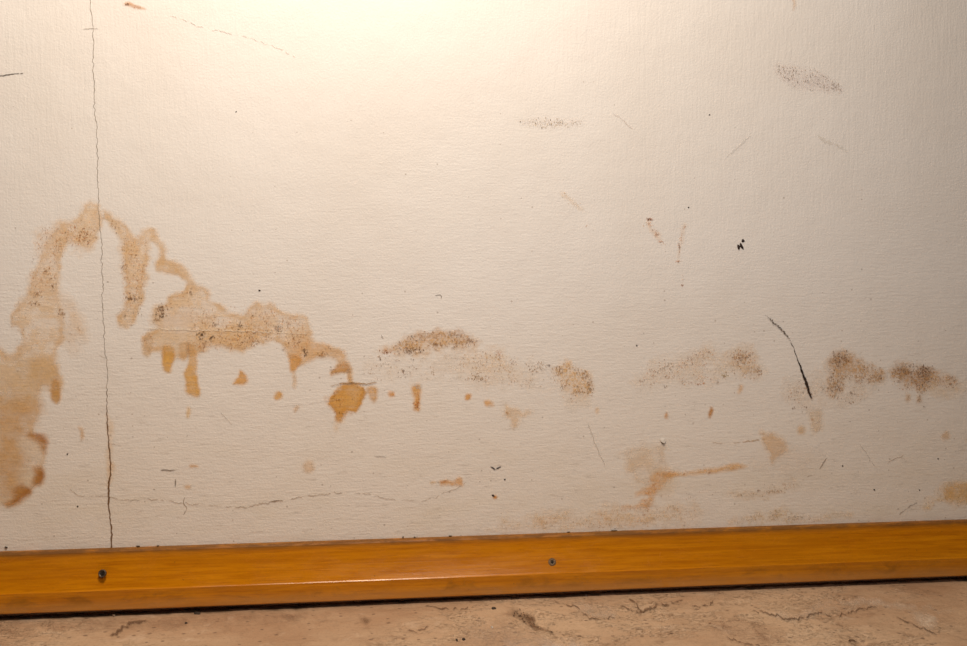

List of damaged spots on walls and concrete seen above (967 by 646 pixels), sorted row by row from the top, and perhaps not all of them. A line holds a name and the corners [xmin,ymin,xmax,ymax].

crack [89,0,198,548]
water stain [0,209,376,505]
water stain [379,331,477,373]
water stain [820,352,955,399]